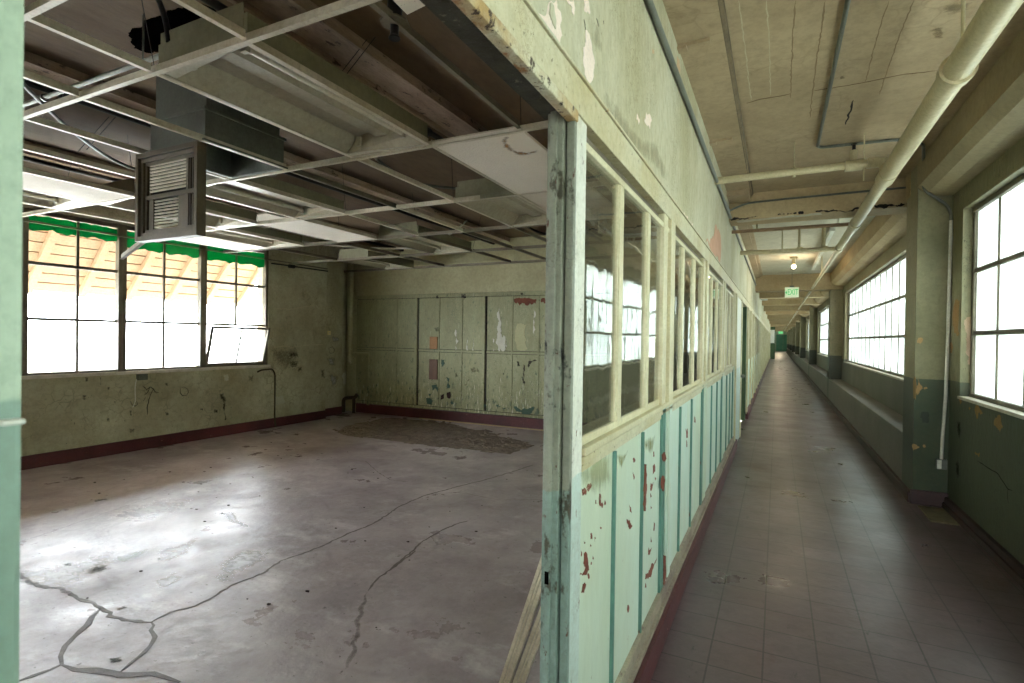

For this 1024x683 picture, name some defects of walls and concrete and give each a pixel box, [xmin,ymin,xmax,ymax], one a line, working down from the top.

peeling [540,0,590,42]
peeling [583,30,595,83]
crack [738,0,931,125]
peeling [730,207,859,223]
peeling [493,311,507,351]
peeling [514,293,545,333]
peeling [426,360,453,405]
peeling [627,451,667,529]
crack [19,465,532,683]
peeling [580,527,602,593]
peeling [645,523,666,587]